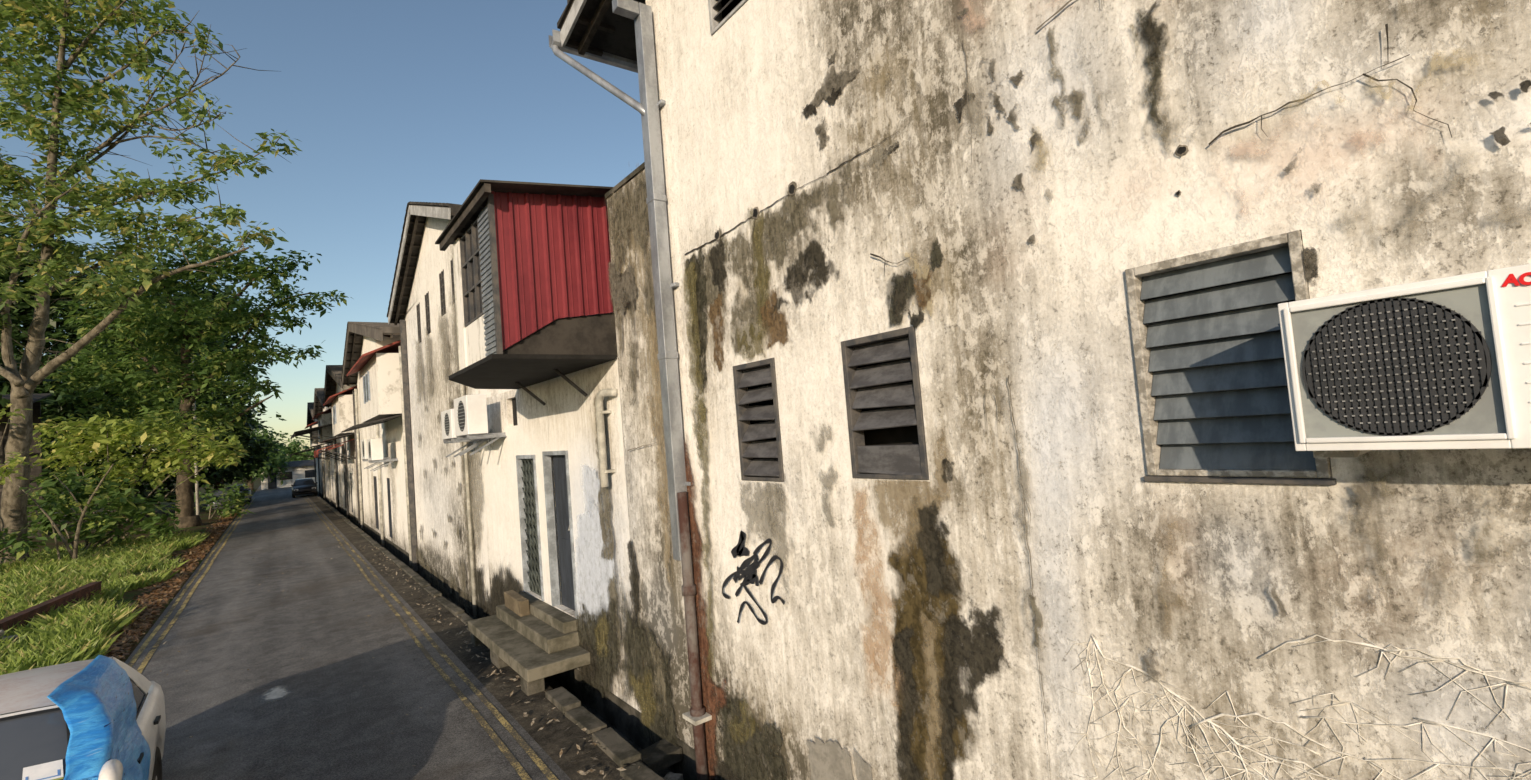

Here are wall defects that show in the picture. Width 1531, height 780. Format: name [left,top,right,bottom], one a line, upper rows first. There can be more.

crack [1036,0,1102,30]
leakage [1130,0,1173,151]
crack [1209,24,1452,145]
leakage [608,172,657,403]
leakage [887,238,944,328]
rust [646,311,670,583]
leakage [684,155,852,678]
rust [684,443,726,780]
leakage [874,432,1007,780]